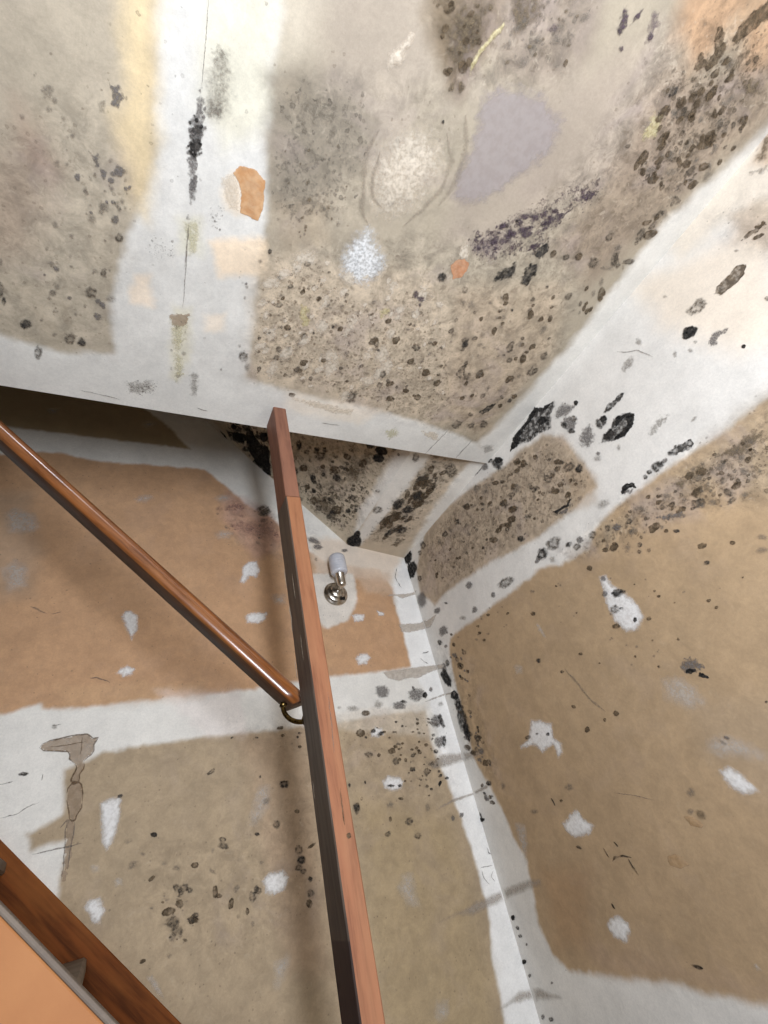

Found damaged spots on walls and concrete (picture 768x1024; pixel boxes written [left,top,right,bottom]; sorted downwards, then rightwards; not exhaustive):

water stain [618,9,657,51]
water stain [634,2,768,190]
peeling [224,166,265,221]
water stain [468,178,600,286]
water stain [239,231,517,429]
water stain [528,286,606,322]
water stain [682,326,698,339]
water stain [716,264,746,295]
water stain [220,423,272,475]
water stain [291,430,399,522]
water stain [342,461,456,552]
water stain [535,435,768,563]